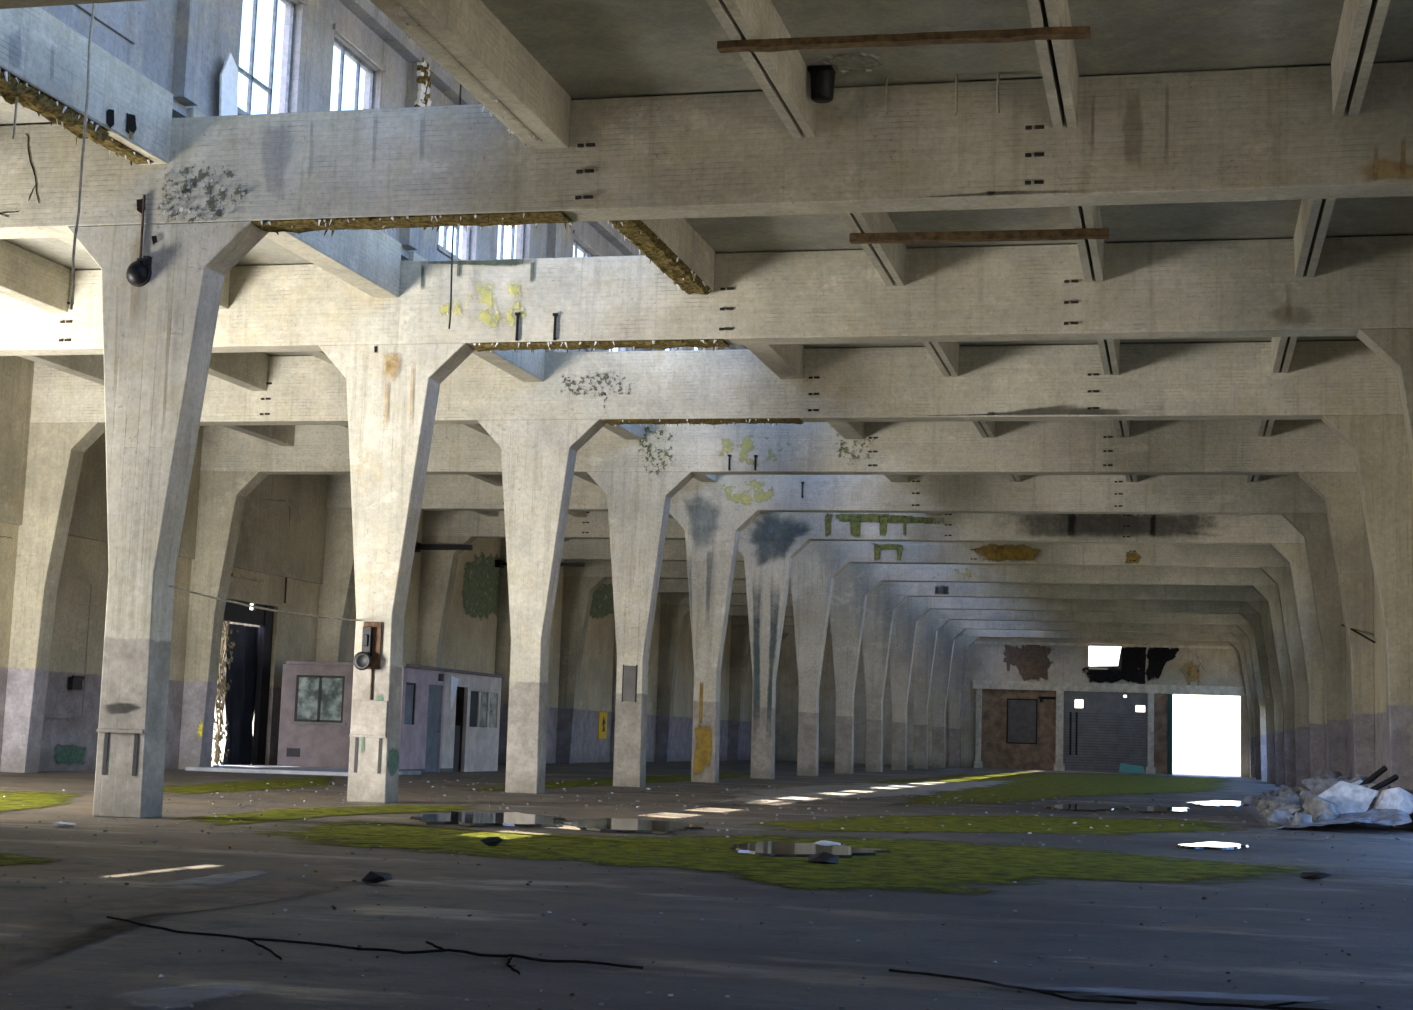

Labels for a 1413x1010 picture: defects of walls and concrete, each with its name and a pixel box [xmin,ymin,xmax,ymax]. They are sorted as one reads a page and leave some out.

corrosion [1368,142,1413,179]
water stain [561,373,631,408]
crack [106,916,643,975]
crack [889,969,1330,1010]